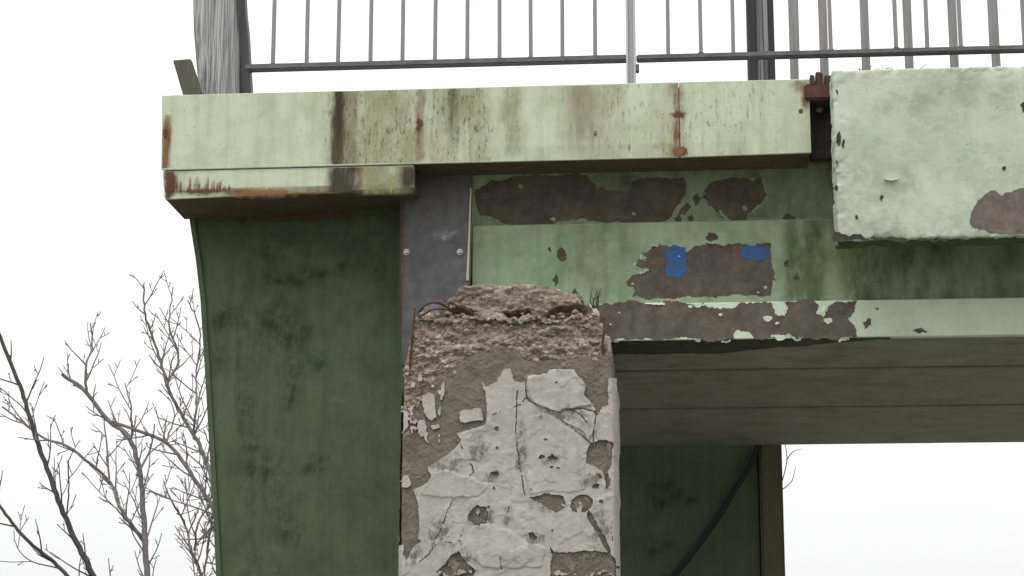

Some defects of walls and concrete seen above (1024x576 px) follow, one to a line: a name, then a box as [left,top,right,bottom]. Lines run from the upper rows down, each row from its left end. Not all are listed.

corrosion [162,117,286,199]
corrosion [306,186,332,194]
damp [330,91,408,193]
peeling [475,173,769,225]
corrosion [672,83,687,157]
peeling [970,188,1024,235]
crack [492,374,612,513]
spalling [399,232,890,576]
crack [419,438,474,562]